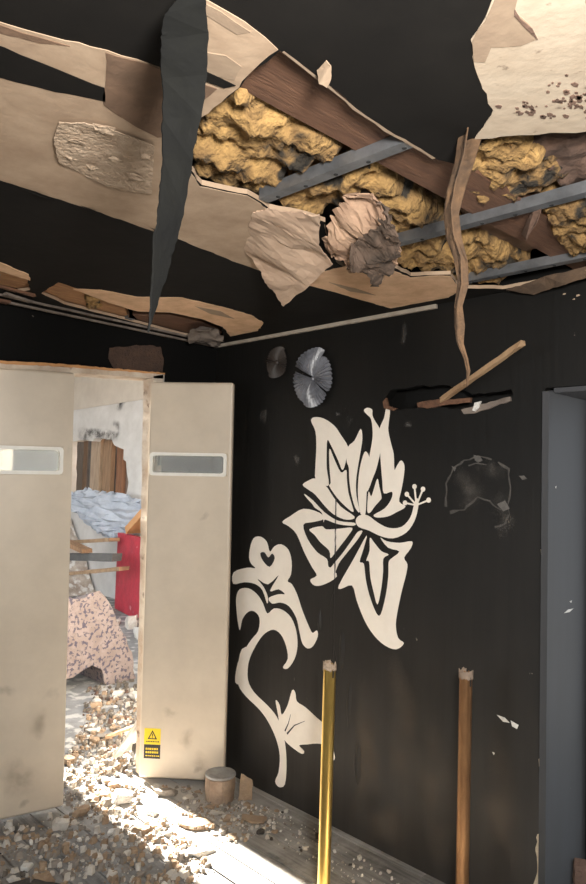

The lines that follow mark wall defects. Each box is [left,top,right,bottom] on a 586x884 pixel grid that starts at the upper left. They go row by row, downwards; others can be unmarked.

peeling [0,22,163,231]
peeling [202,0,278,117]
peeling [471,0,586,139]
peeling [0,262,30,280]
peeling [178,174,267,270]
spalling [417,397,512,414]